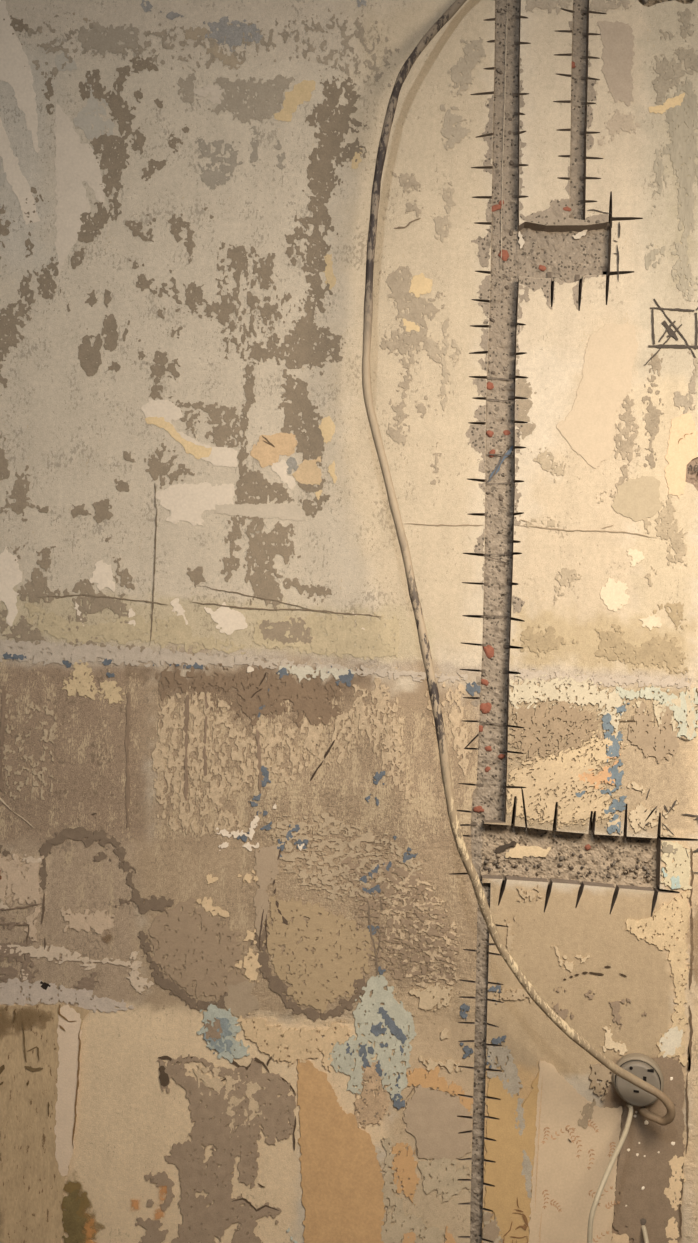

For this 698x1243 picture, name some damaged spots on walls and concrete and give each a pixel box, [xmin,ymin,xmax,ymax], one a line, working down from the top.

spalling [518,58,609,249]
flaking render [587,0,698,302]
flaking render [0,0,534,1243]